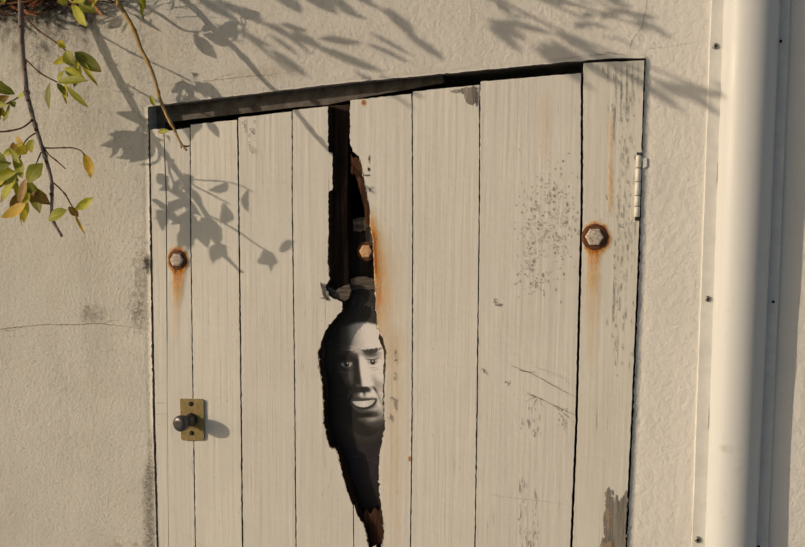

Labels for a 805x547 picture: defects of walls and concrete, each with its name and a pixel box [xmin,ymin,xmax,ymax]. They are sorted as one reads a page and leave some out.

peeling [449,85,479,106]
corrosion [168,247,188,288]
corrosion [370,224,381,310]
corrosion [584,222,611,269]
peeling [599,487,629,547]